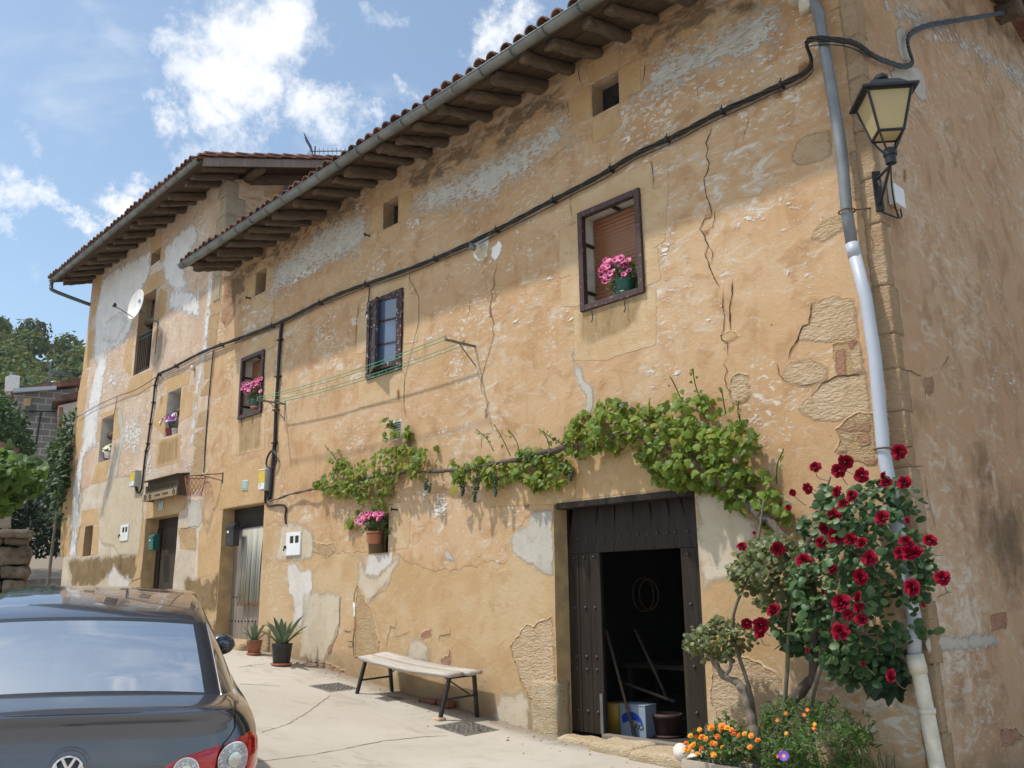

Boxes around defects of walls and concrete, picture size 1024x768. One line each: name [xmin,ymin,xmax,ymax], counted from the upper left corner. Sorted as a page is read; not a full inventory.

peeling [70,251,150,557]
peeling [121,409,156,477]
peeling [163,221,250,474]
peeling [267,207,371,299]
crack [465,261,497,436]
crack [699,130,733,397]
spalling [782,292,878,467]
spalling [354,585,380,658]
spalling [510,615,556,699]